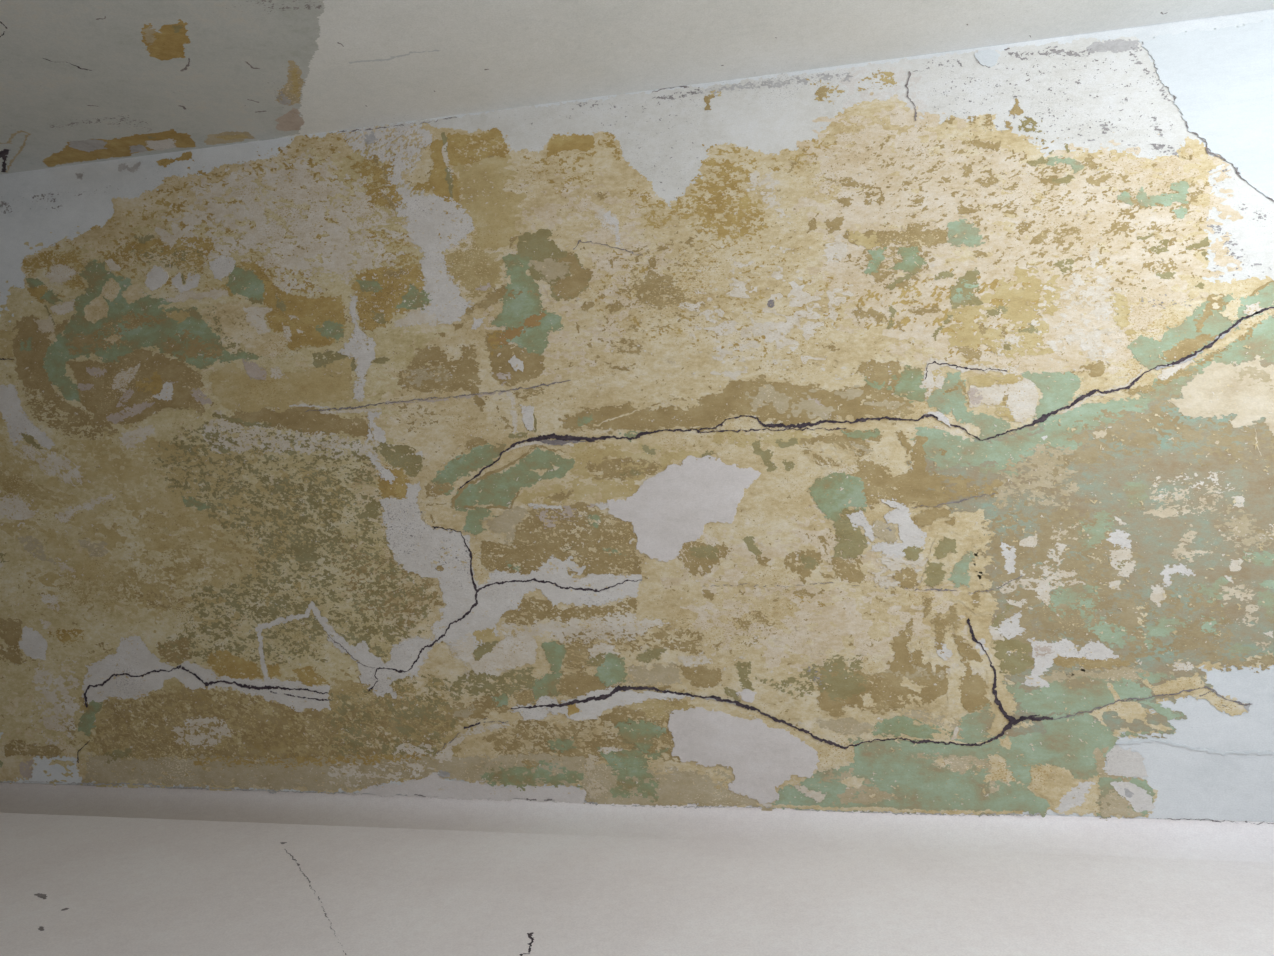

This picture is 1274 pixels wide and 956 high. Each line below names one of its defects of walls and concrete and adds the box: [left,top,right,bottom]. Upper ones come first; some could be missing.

peeling [140,19,190,71]
crack [905,70,918,121]
crack [1155,67,1274,201]
crack [573,211,641,255]
peeling [0,36,1274,794]
crack [459,307,1274,490]
crack [328,526,638,692]
crack [437,575,1251,754]
peeling [720,763,843,811]
peeling [934,752,1123,819]